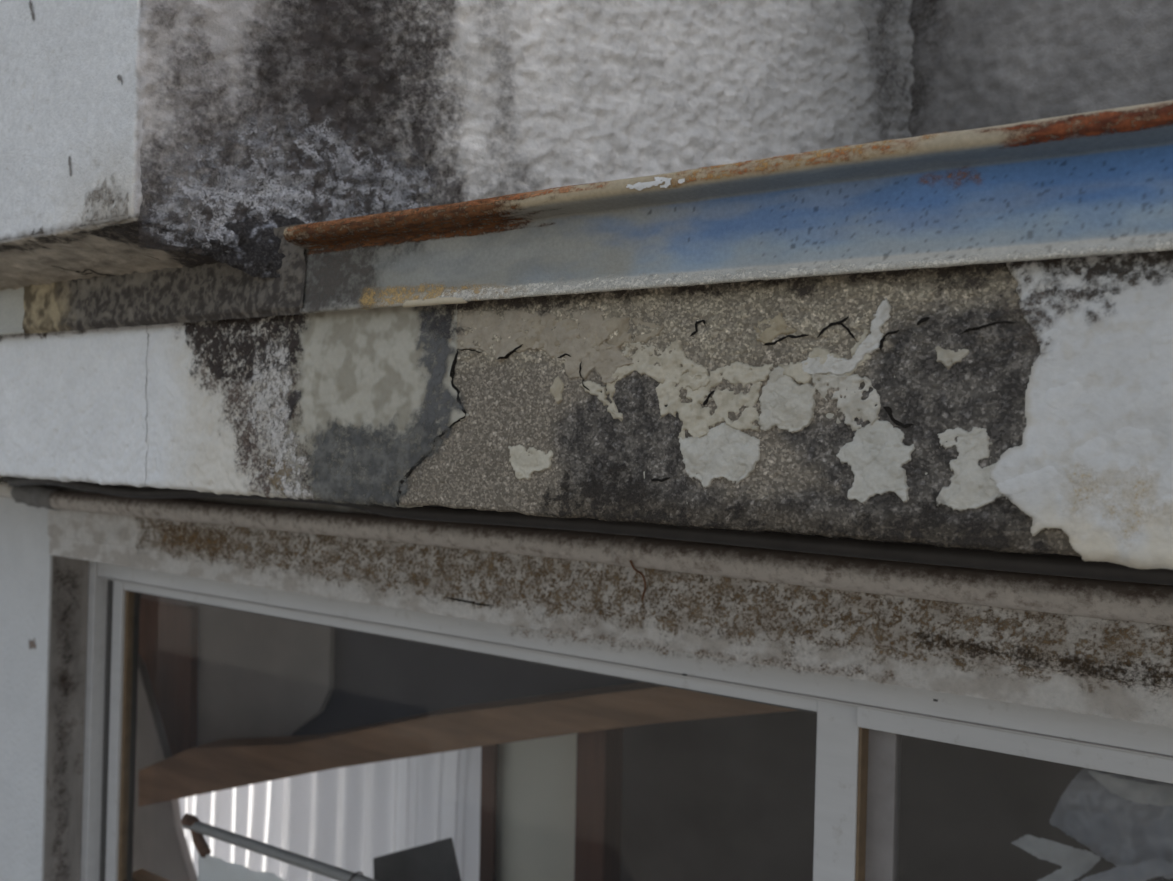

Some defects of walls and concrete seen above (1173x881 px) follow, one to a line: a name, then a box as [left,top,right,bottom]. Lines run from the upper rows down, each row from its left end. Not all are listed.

water stain [0,0,463,268]
corrosion [283,182,606,255]
corrosion [671,140,893,187]
corrosion [983,103,1173,147]
peeling [1142,239,1171,252]
water stain [184,304,463,508]
crack [396,344,523,506]
peeling [400,245,1128,557]
water stain [543,462,1027,554]
water stain [135,517,1173,692]